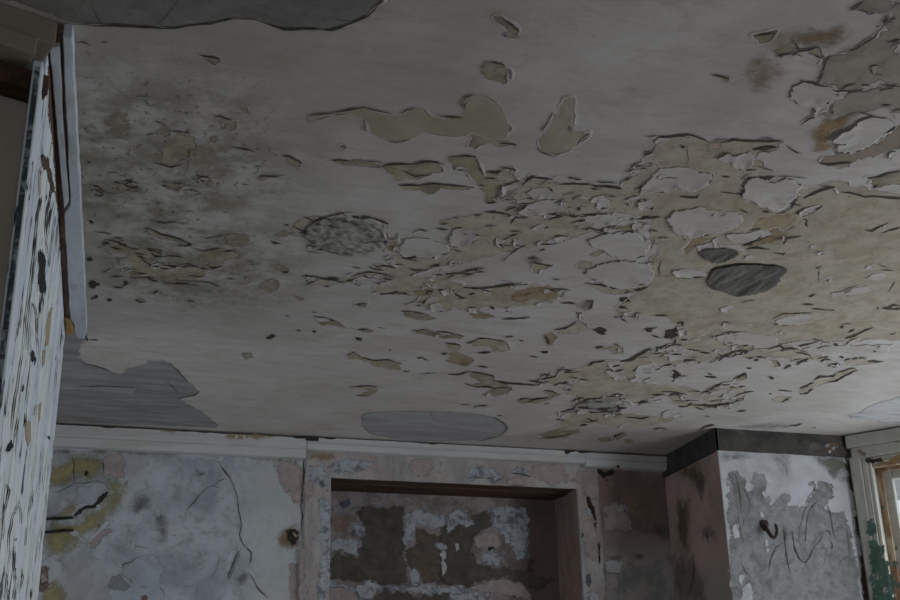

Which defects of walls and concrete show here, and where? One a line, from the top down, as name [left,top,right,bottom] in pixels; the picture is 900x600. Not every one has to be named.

spalling [3,0,388,31]
peeling [4,64,62,457]
peeling [268,0,900,443]
spalling [56,321,221,429]
peeling [3,484,49,600]
peeling [51,457,110,516]
crack [190,466,268,597]
peeling [274,454,555,600]
peeling [465,463,620,564]
spalling [726,471,900,600]